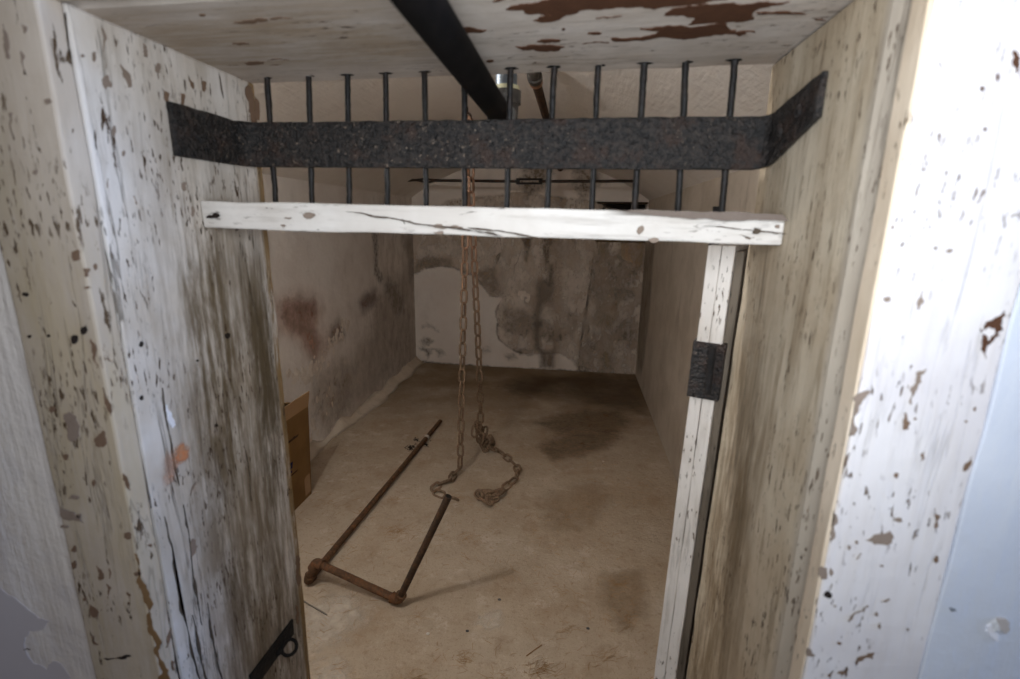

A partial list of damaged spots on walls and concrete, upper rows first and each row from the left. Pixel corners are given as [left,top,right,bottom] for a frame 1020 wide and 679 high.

peeling [492,0,826,52]
peeling [1012,50,1020,73]
crack [346,211,538,264]
peeling [980,311,1006,359]
peeling [849,390,871,437]
peeling [903,369,927,430]
peeling [830,510,838,543]
peeling [848,517,902,560]
peeling [818,566,836,608]
peeling [0,588,71,679]